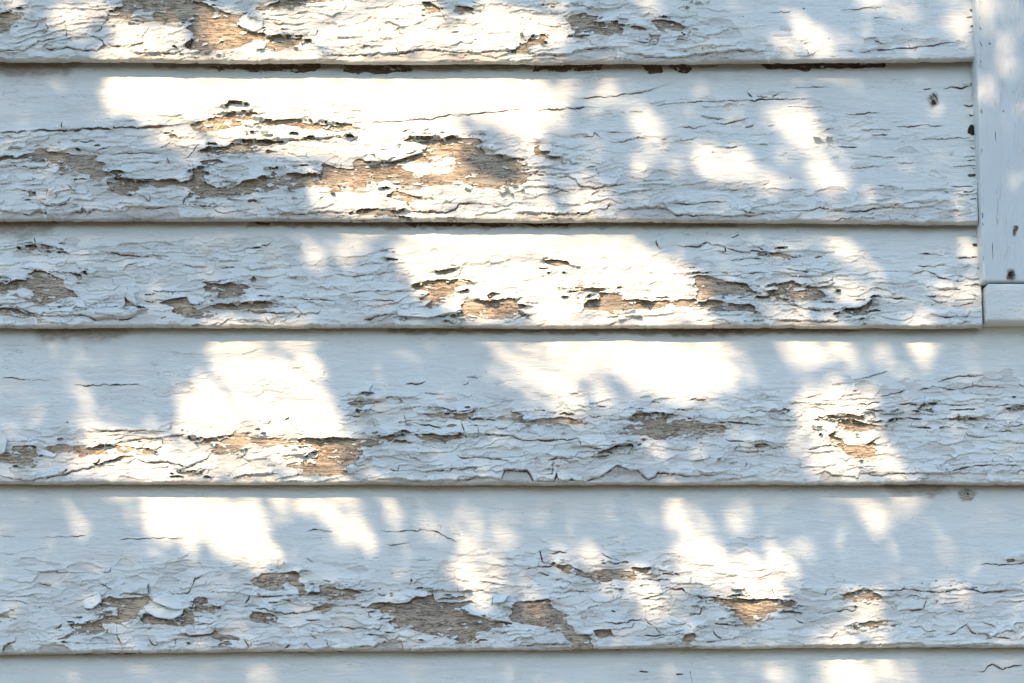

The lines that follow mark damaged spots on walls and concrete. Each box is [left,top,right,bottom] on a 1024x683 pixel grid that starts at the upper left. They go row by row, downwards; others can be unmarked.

peeling [105,0,886,75]
peeling [0,96,596,228]
crack [258,83,998,212]
peeling [365,263,535,329]
peeling [537,254,903,324]
crack [910,236,993,318]
crack [347,381,630,472]
peeling [587,407,734,482]
crack [854,371,1024,446]
peeling [38,566,620,655]
crack [607,579,740,643]
crack [824,562,1024,639]